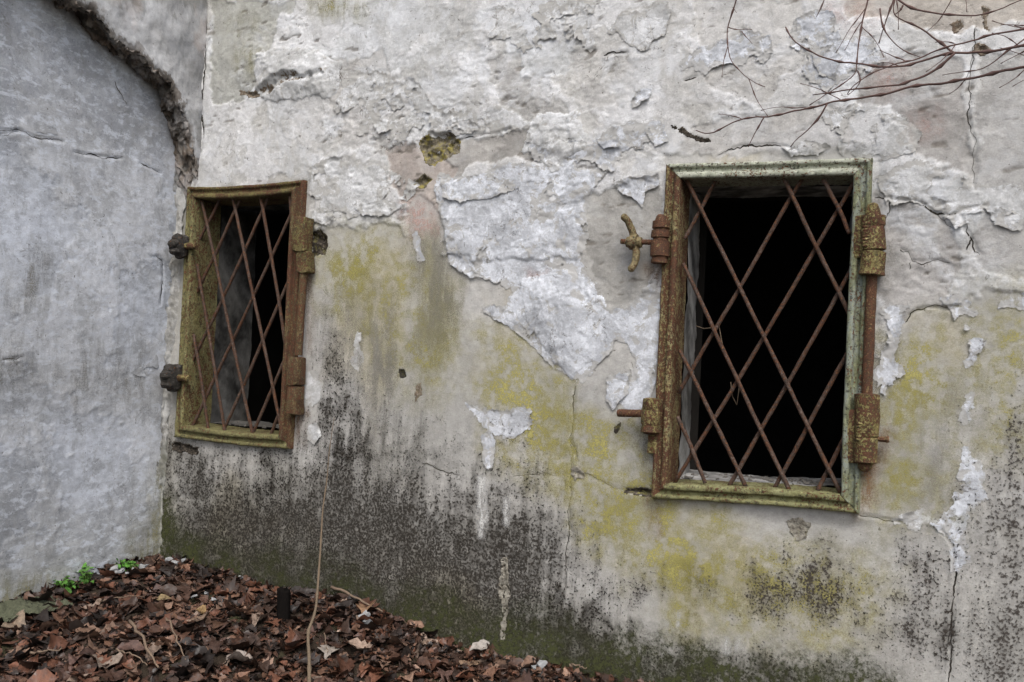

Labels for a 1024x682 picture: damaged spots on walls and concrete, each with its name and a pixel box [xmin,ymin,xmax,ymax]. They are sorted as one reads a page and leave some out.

flaking render [239,68,322,98]
peeling [488,0,604,53]
peeling [607,0,673,51]
crack [967,29,977,177]
peeling [307,69,711,434]
peeling [998,290,1024,310]
peeling [465,402,536,470]
crack [516,386,621,612]
water stain [160,302,1024,682]
peeling [892,446,988,573]
crack [947,543,957,682]